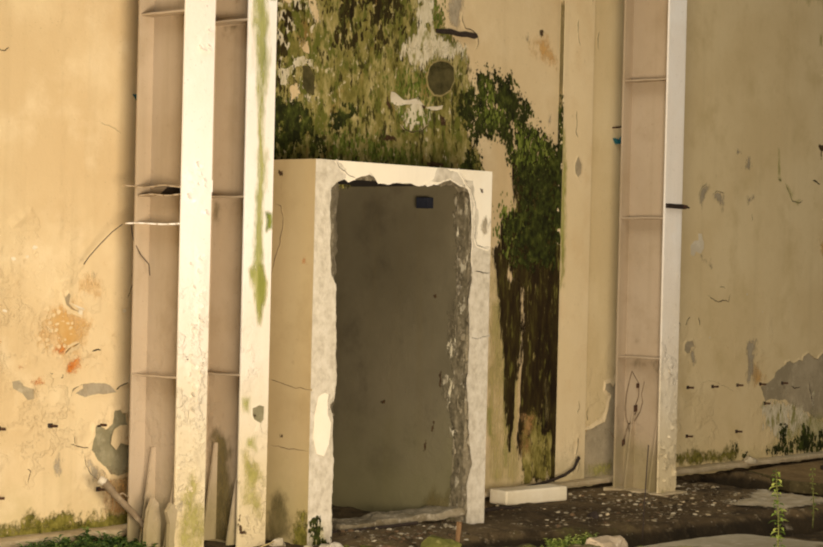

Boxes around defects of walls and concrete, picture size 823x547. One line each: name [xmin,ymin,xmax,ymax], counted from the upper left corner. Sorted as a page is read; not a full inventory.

leakage [276,0,468,102]
flaking render [58,289,85,321]
leakage [250,265,266,314]
leakage [488,2,566,484]
flaking render [8,375,39,407]
flaking render [67,378,130,482]
peeling [176,242,210,493]
flaking render [584,374,616,477]
flaking render [761,349,823,441]